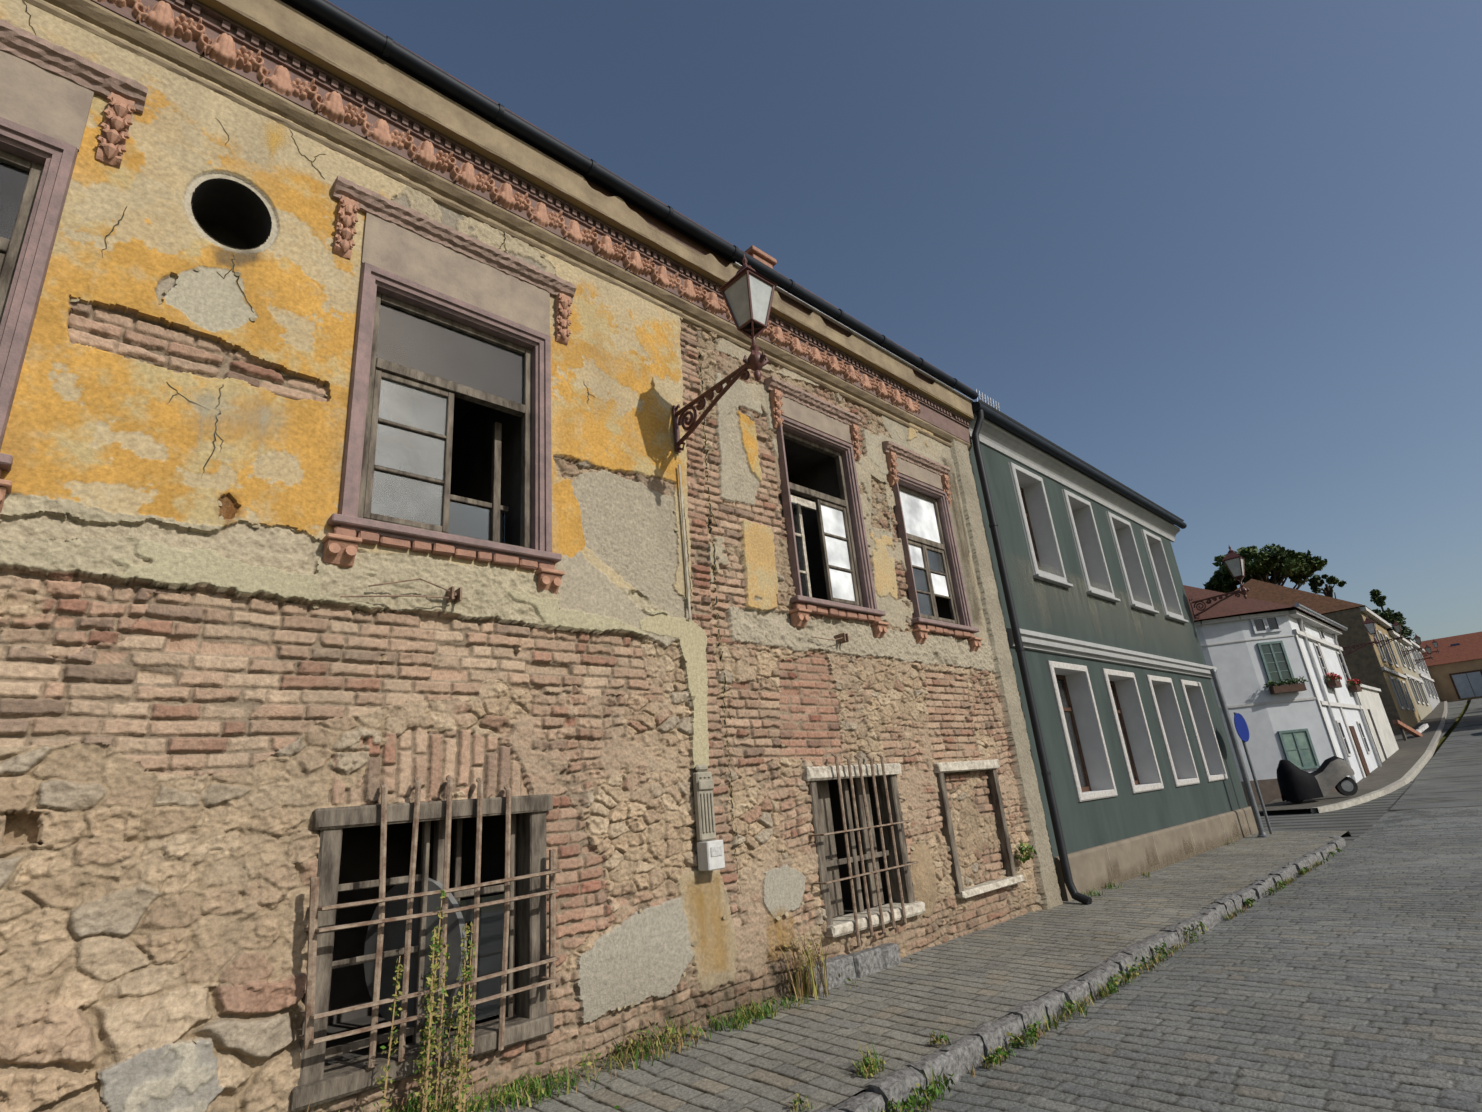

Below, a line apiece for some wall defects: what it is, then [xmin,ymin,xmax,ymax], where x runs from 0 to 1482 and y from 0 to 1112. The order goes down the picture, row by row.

spalling [68,265,331,402]
spalling [871,474,892,532]
spalling [0,318,883,921]
flaking render [576,896,697,1023]